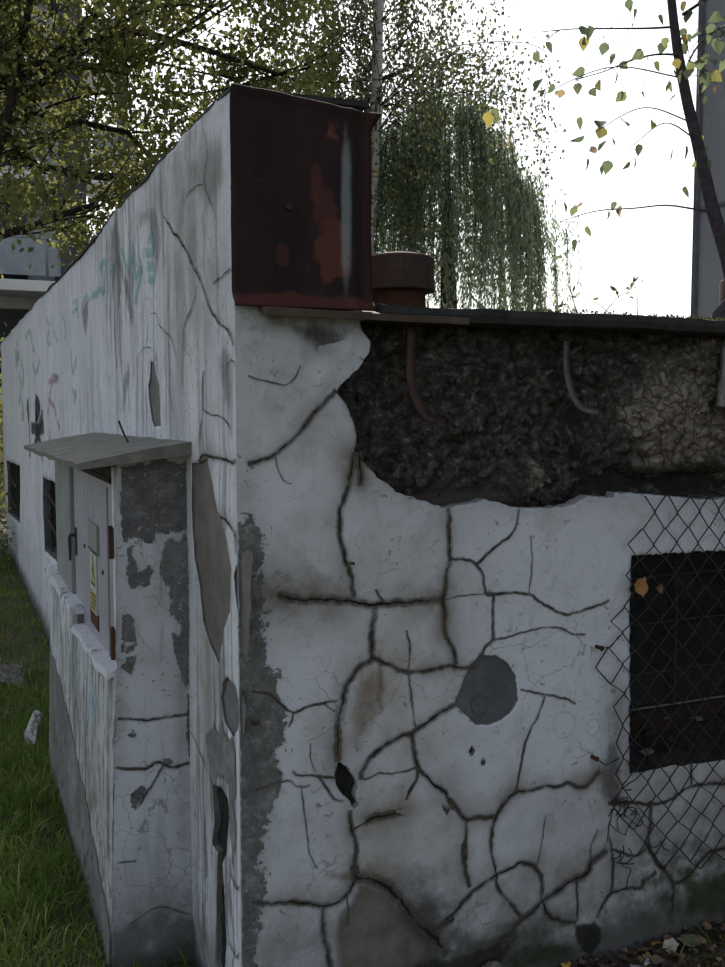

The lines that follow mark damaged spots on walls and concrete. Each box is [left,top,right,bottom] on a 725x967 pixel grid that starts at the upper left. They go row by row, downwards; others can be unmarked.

crack [185,128,215,221]
peeling [150,362,161,426]
crack [137,214,337,484]
spalling [337,323,725,507]
crack [115,712,212,805]
peeling [120,458,288,967]
spalling [335,762,355,805]
crack [230,451,725,967]
spalling [454,655,517,724]
water stain [416,934,516,967]
water stain [576,922,601,954]